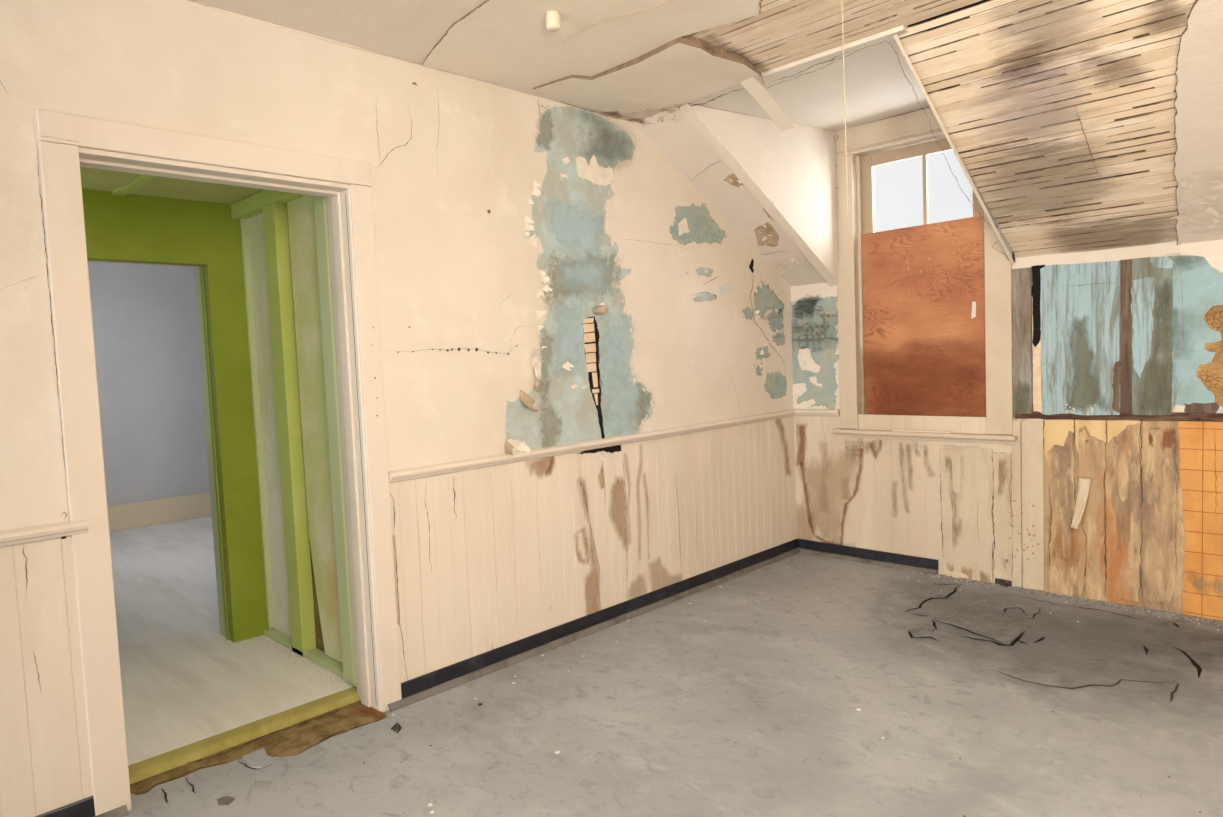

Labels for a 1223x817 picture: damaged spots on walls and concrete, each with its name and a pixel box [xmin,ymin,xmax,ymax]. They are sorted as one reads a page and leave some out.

crack [189,0,489,166]
crack [392,293,530,355]
peeling [505,103,687,461]
peeling [670,203,733,302]
flaking render [681,0,1223,413]
leakage [578,460,601,615]
leakage [599,454,627,556]